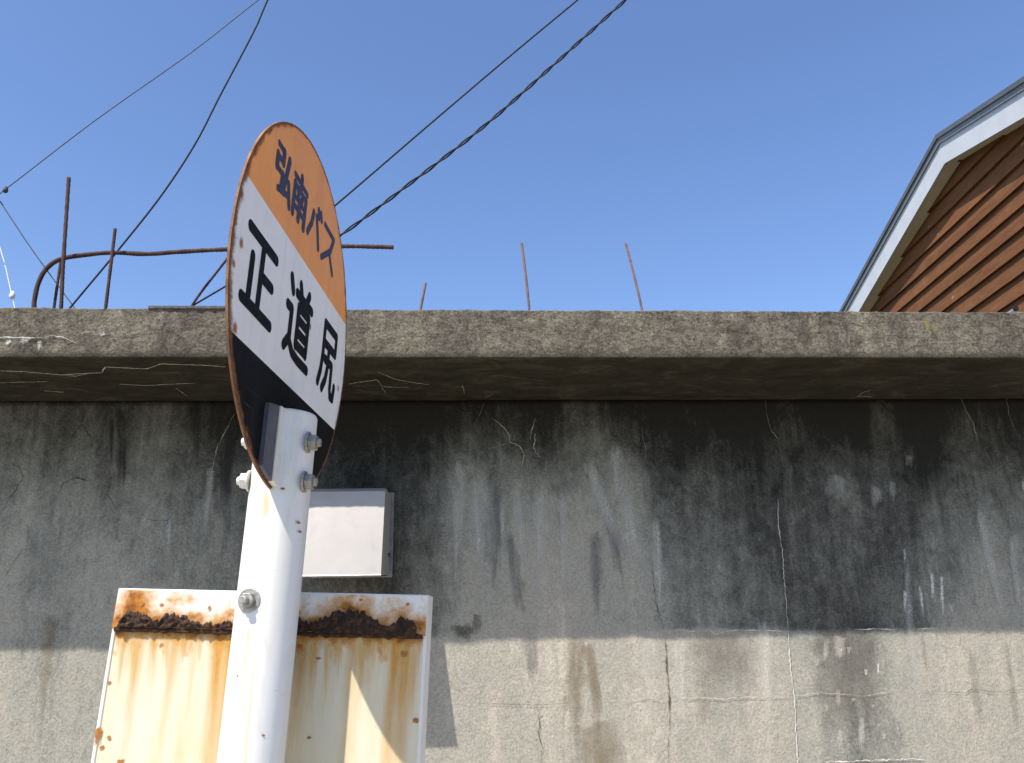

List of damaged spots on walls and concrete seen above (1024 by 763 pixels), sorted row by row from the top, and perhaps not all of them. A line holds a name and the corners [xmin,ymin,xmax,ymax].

crack [0,320,220,396]
crack [462,386,540,482]
crack [630,503,924,763]